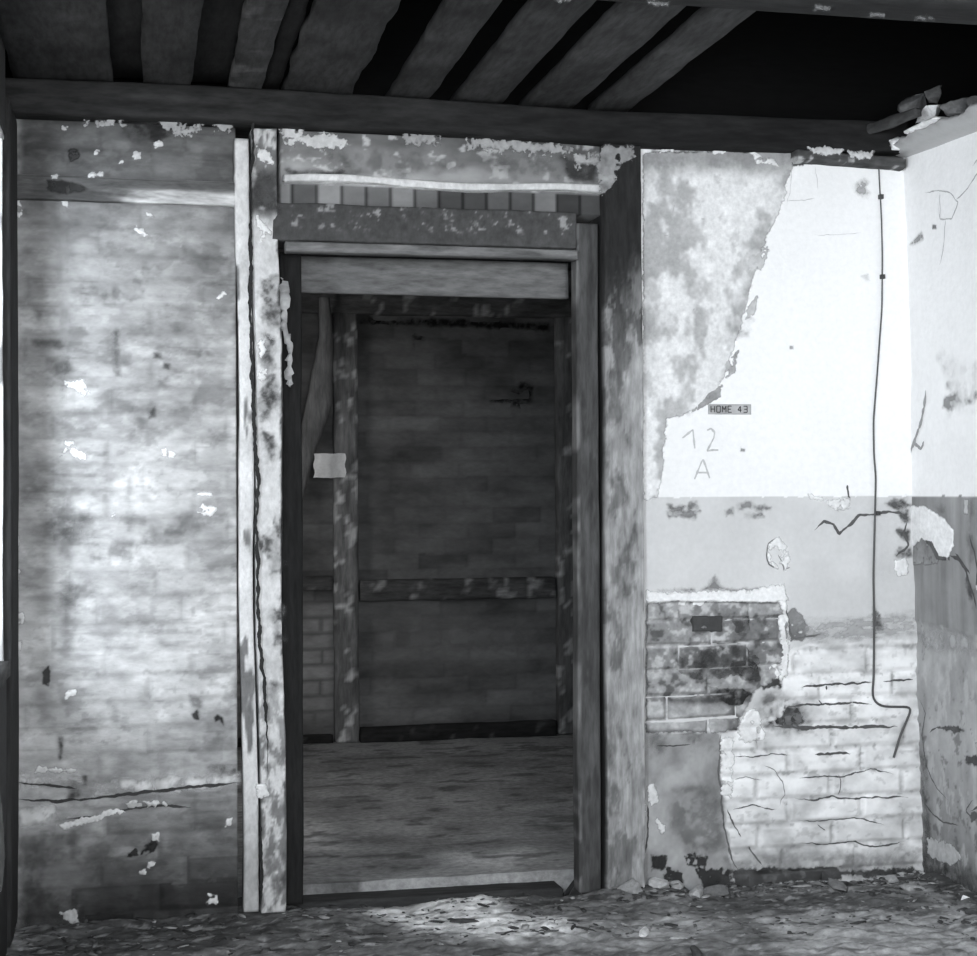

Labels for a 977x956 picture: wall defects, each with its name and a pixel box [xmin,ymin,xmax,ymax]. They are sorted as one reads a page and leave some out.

flaking render [279,129,348,149]
peeling [253,146,279,242]
peeling [262,280,280,325]
flaking render [597,144,804,500]
peeling [257,335,277,417]
peeling [262,431,274,456]
crack [815,485,909,555]
spalling [894,505,954,577]
spalling [645,601,808,798]
peeling [256,784,269,798]
flaking render [645,784,659,812]
spalling [651,853,914,888]